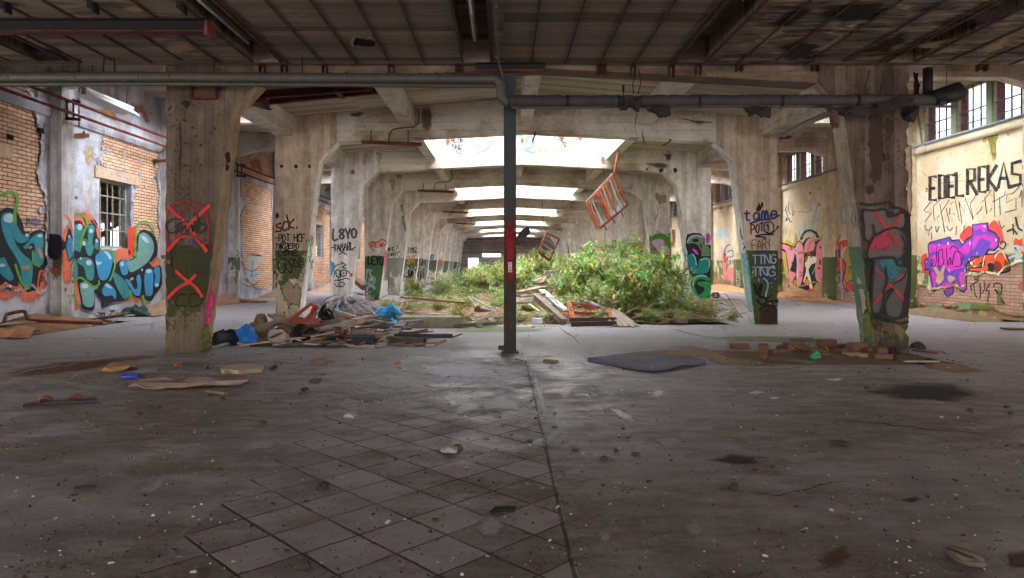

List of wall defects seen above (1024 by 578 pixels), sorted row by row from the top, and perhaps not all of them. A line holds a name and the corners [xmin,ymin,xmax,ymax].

spalling [7,87,39,98]
spalling [0,101,50,296]
spalling [93,135,161,264]
spalling [176,119,311,309]
peeling [865,113,895,195]
damp [868,383,972,401]